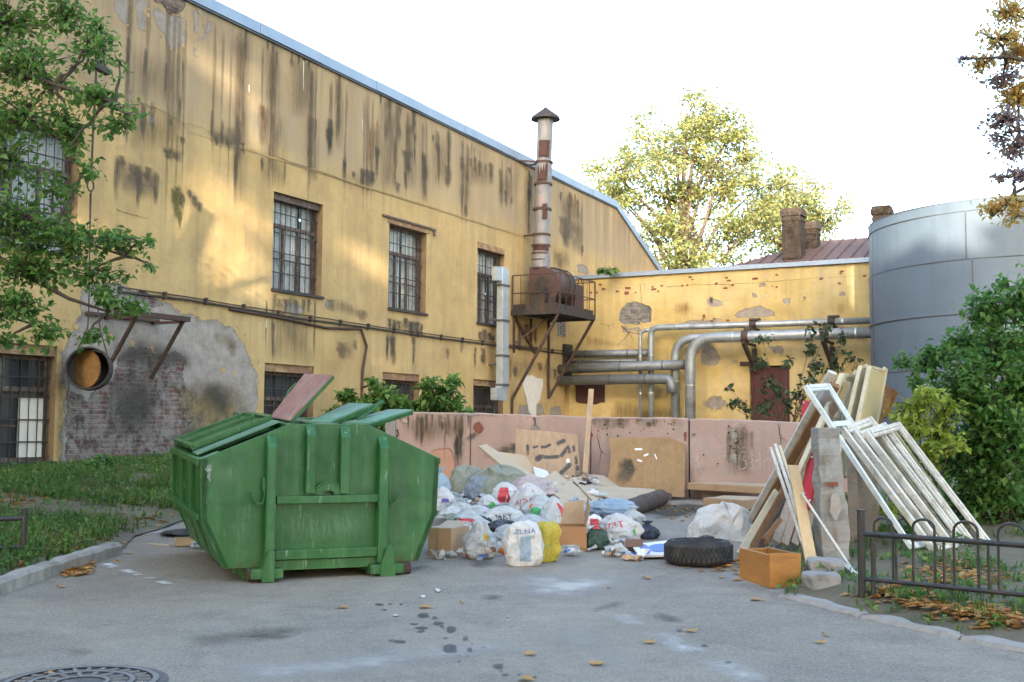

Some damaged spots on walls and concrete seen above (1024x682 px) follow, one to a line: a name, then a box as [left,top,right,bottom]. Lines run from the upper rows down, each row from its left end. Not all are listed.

damp [114,158,157,199]
damp [126,14,185,157]
peeling [114,0,212,57]
damp [172,188,200,226]
damp [211,30,250,182]
damp [261,40,285,178]
damp [291,52,347,167]
damp [343,95,510,215]
rust [537,139,550,182]
flaking render [681,274,806,324]
peeling [59,272,261,465]
damp [407,415,469,456]